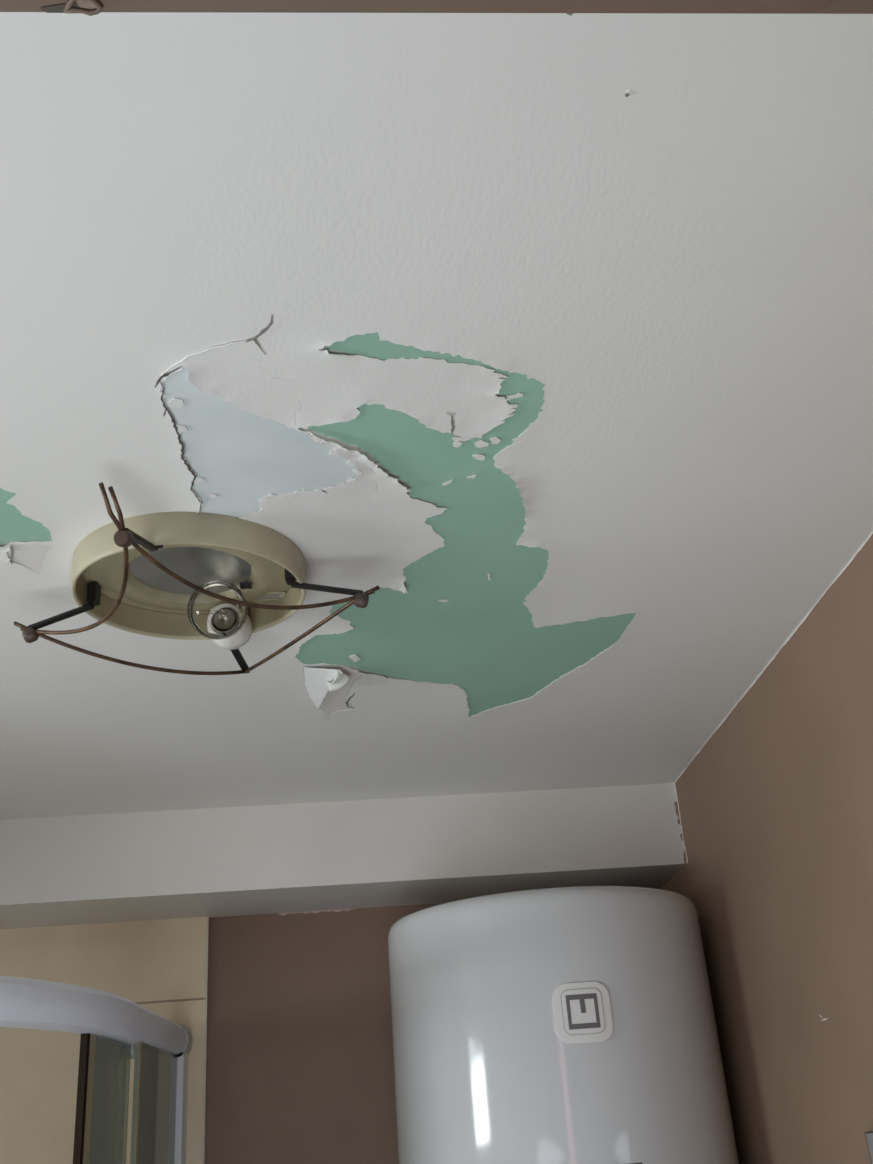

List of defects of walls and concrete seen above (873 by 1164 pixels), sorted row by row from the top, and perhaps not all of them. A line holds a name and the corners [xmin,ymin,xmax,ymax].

spalling [40,0,103,16]
peeling [0,472,66,582]
peeling [145,317,654,732]